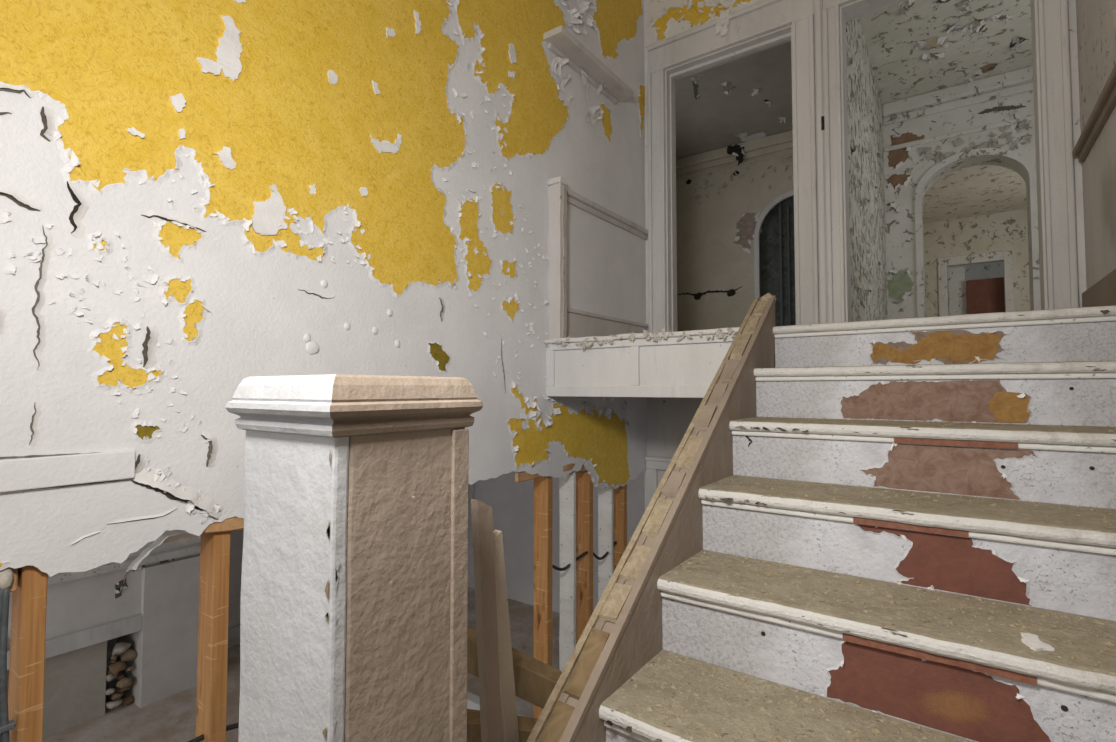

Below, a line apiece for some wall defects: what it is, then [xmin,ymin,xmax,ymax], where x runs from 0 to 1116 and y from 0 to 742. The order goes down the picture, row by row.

peeling [686,132,793,205]
crack [141,209,206,232]
crack [0,181,89,371]
peeling [0,0,763,524]
crack [677,286,742,300]
peeling [868,329,1012,366]
crack [0,402,100,459]
peeling [839,379,1033,425]
crack [28,454,148,490]
peeling [859,438,1041,501]
peeling [853,517,1034,607]
peeling [819,632,1054,742]